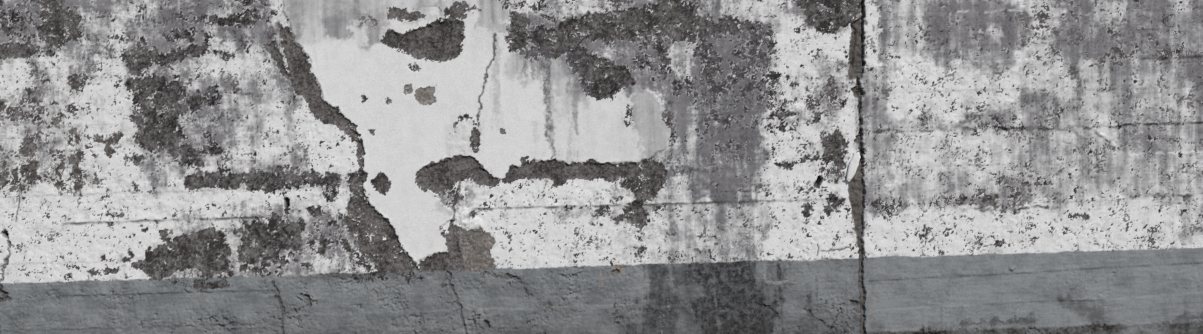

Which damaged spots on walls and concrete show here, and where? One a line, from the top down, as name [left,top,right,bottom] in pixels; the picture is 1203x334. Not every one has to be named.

spalling [0,0,861,291]
leakage [618,0,850,334]
crack [753,0,867,334]
leakage [862,0,1017,141]
leakage [1039,0,1203,156]
crack [0,183,22,334]
leakage [916,273,1109,334]
leakage [1150,295,1203,334]